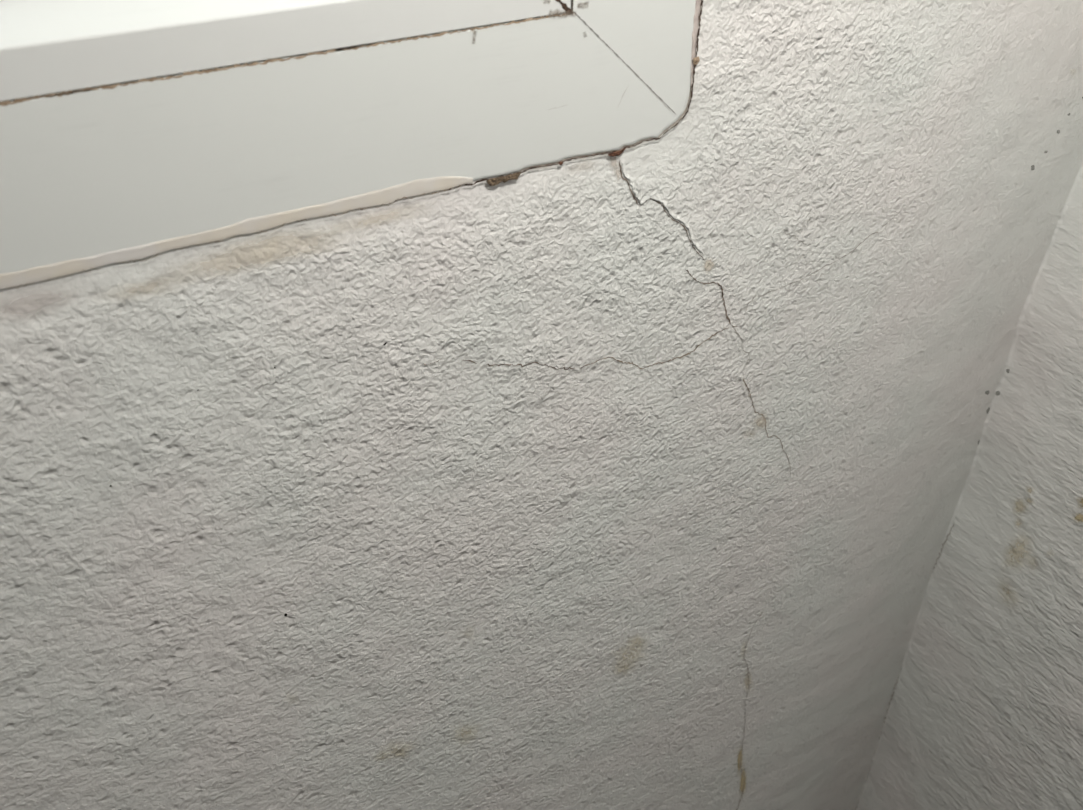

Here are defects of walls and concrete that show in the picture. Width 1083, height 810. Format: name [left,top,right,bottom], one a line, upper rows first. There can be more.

crack [5,0,903,475]
crack [737,613,762,809]